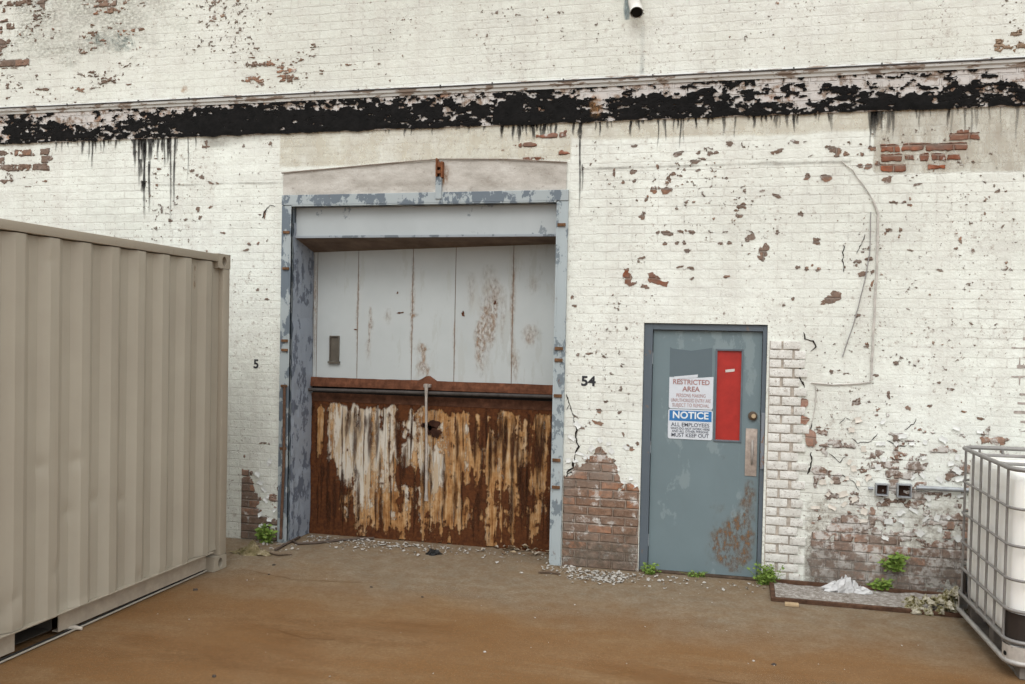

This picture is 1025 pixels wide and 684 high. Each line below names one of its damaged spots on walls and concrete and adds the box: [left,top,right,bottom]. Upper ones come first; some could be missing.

peeling [0,0,60,106]
peeling [166,0,337,93]
water stain [131,137,196,195]
peeling [583,139,806,278]
flaking render [825,127,980,295]
water stain [866,106,1025,170]
peeling [607,256,669,311]
corrosion [309,393,552,552]
crack [566,394,580,477]
spalling [562,321,639,572]
peeling [800,307,1009,593]
corrosion [713,487,754,567]